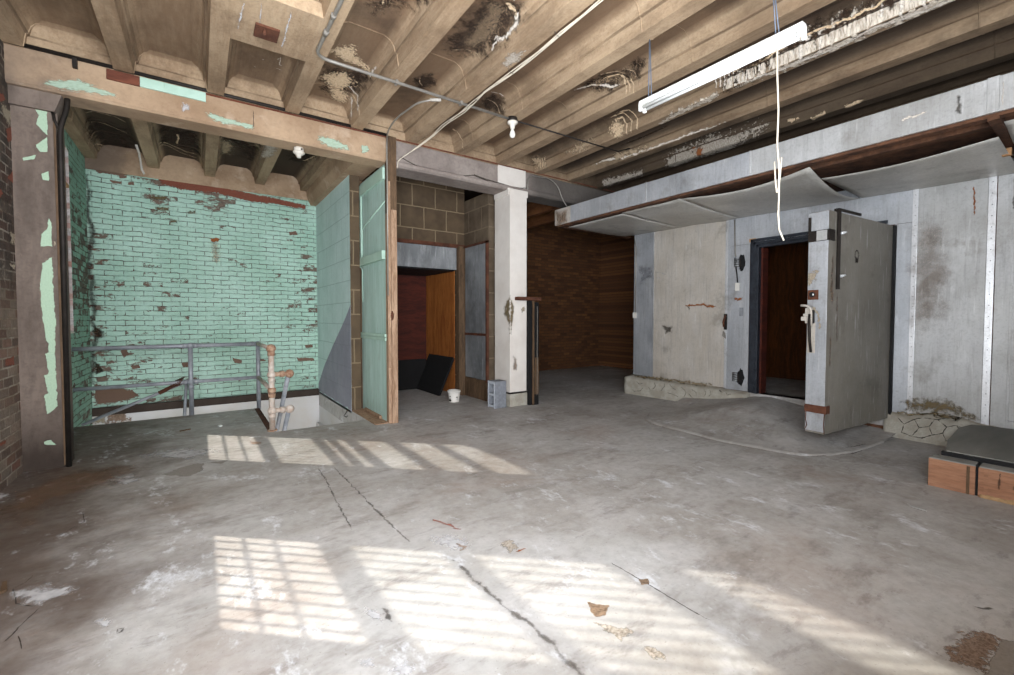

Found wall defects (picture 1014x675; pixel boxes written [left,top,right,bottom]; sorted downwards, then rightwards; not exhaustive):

damp [448,0,521,59]
damp [319,42,376,117]
damp [578,59,645,94]
damp [592,0,957,166]
peeling [23,138,48,161]
peeling [96,170,134,185]
peeling [158,179,306,209]
peeling [41,219,56,246]
peeling [92,382,140,424]
spalling [944,631,1002,673]